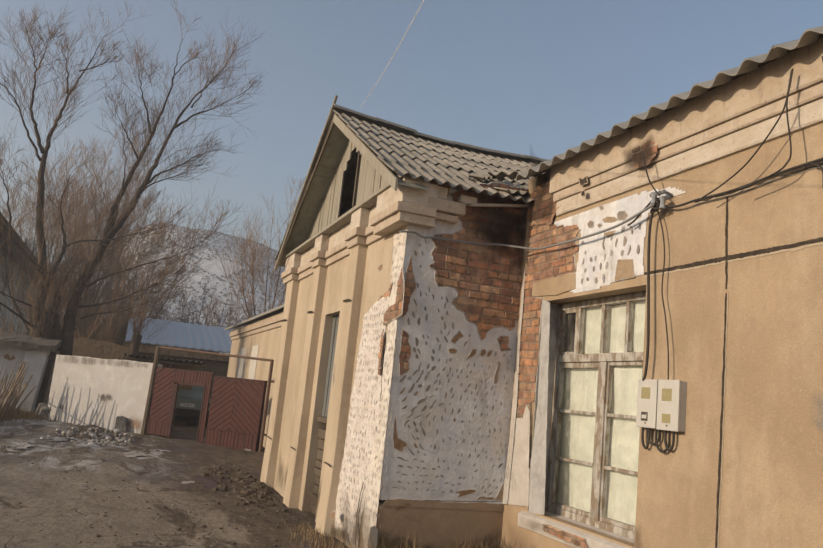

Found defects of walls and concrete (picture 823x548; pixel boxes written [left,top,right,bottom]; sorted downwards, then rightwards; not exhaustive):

spalling [615,259,635,281]
peeling [428,176,628,418]
peeling [378,255,416,376]
spalling [393,416,408,452]
flaking render [542,524,589,548]